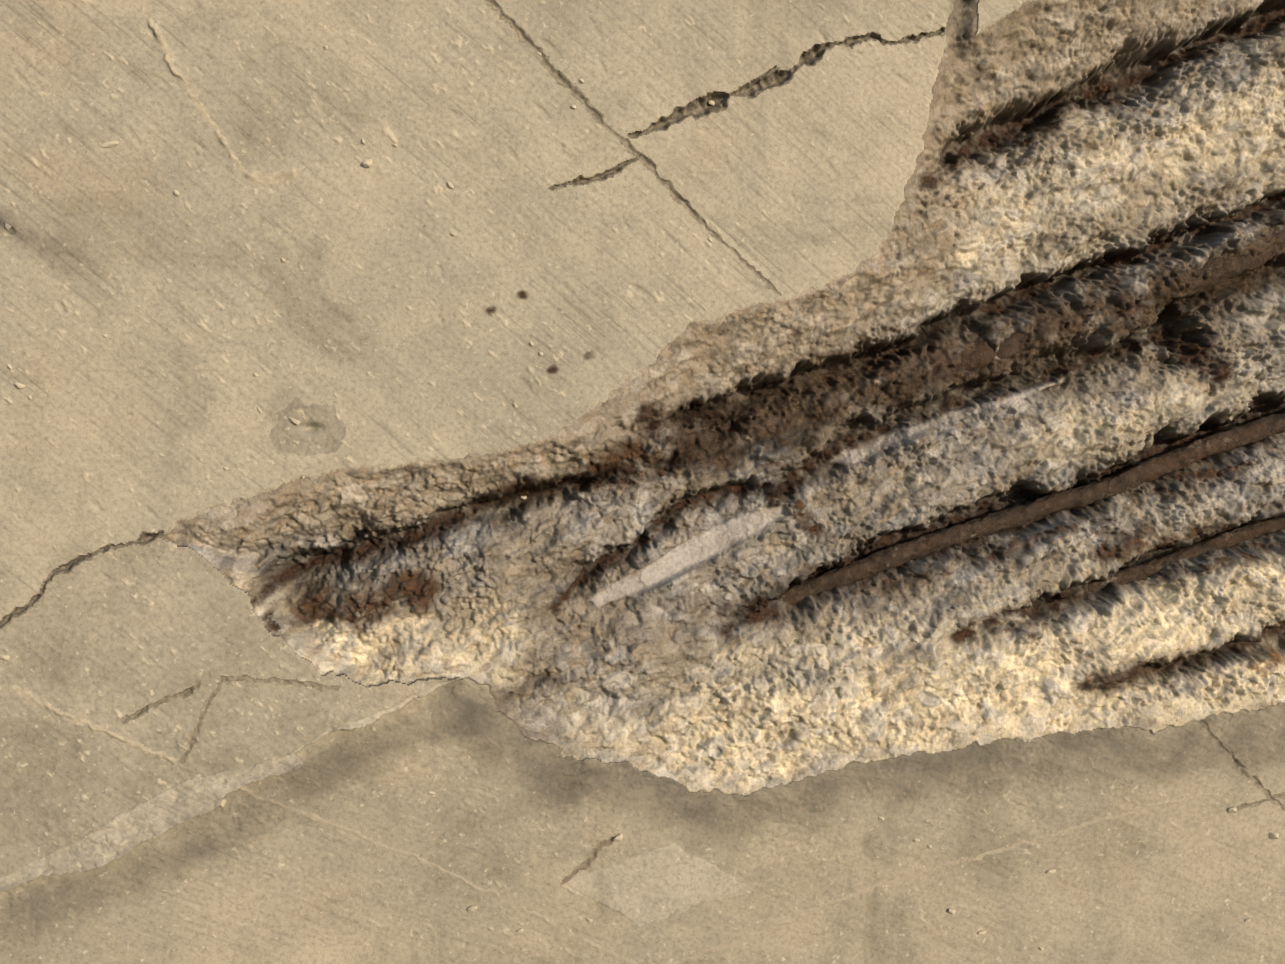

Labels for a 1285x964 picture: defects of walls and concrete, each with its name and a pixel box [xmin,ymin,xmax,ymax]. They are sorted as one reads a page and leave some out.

crack [548,27,946,191]
spalling [160,0,1285,797]
rust [250,193,1285,643]
crack [0,530,165,628]
crack [120,679,202,725]
peeling [0,538,461,892]
crack [1199,719,1285,813]